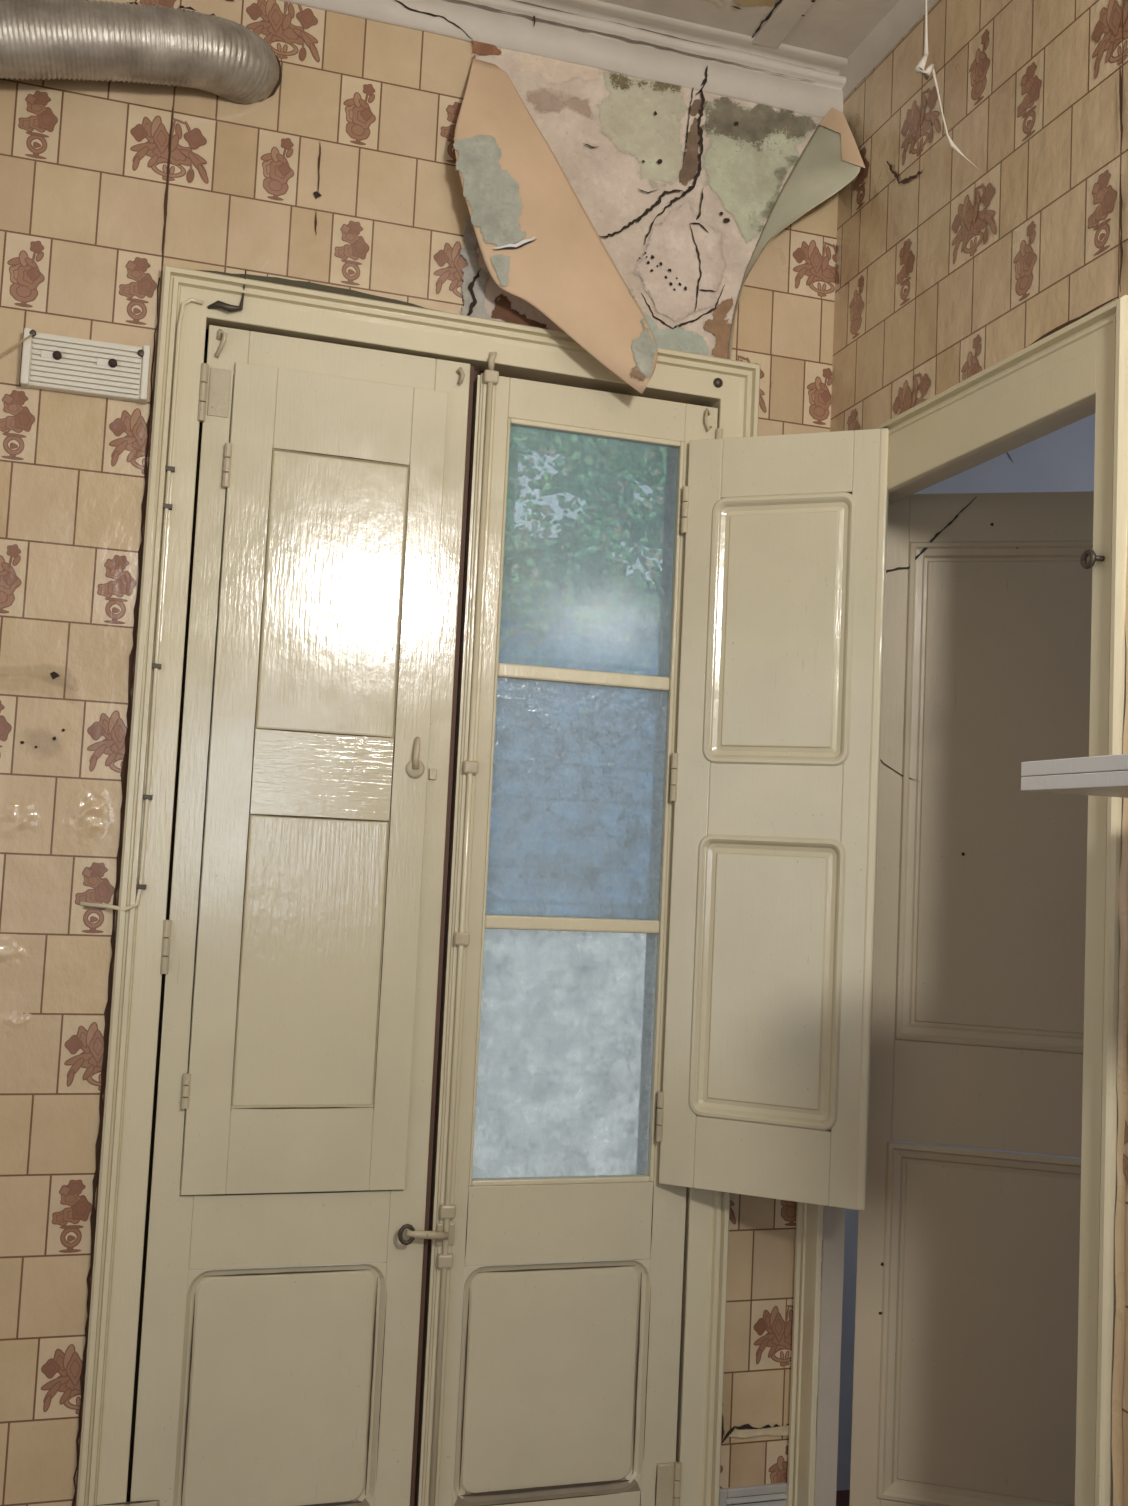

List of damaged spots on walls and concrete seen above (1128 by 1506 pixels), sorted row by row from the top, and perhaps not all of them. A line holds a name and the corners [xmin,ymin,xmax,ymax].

crack [752,0,782,38]
peeling [453,134,564,332]
crack [600,66,716,310]
flaking render [470,40,865,378]